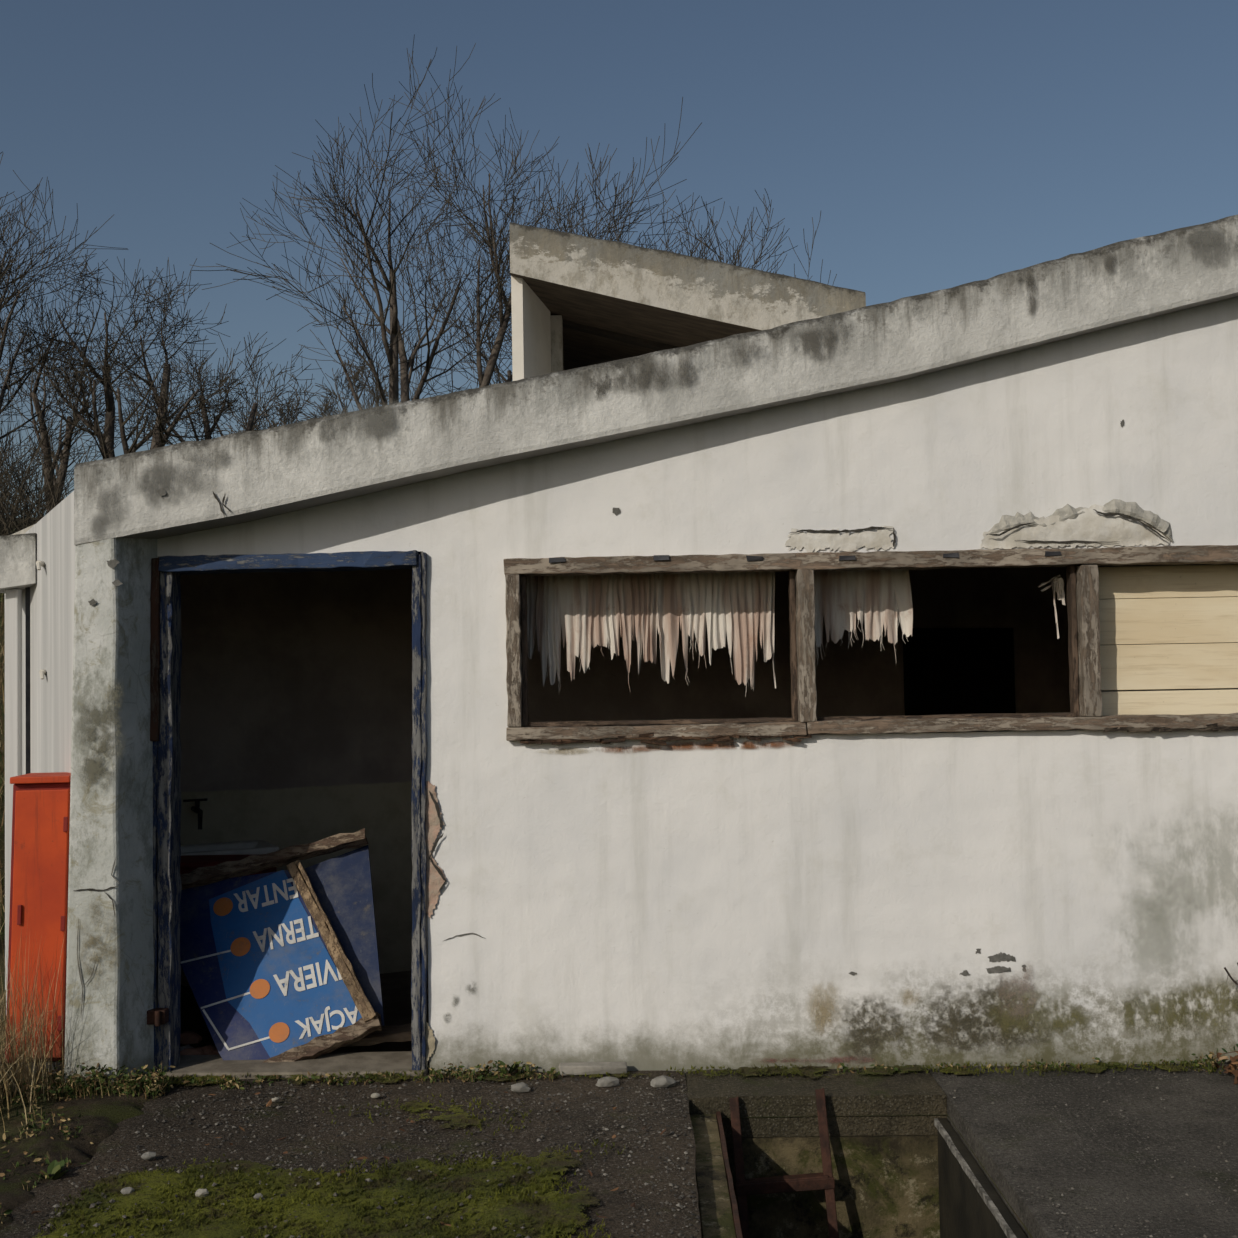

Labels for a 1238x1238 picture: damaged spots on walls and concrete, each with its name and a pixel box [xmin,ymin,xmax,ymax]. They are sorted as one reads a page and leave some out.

leakage [1105,254,1116,271]
leakage [1017,274,1036,313]
leakage [82,686,120,788]
flaking render [425,781,446,918]
peeling [976,949,1026,974]
leakage [932,975,1085,1048]
leakage [1125,1004,1185,1027]